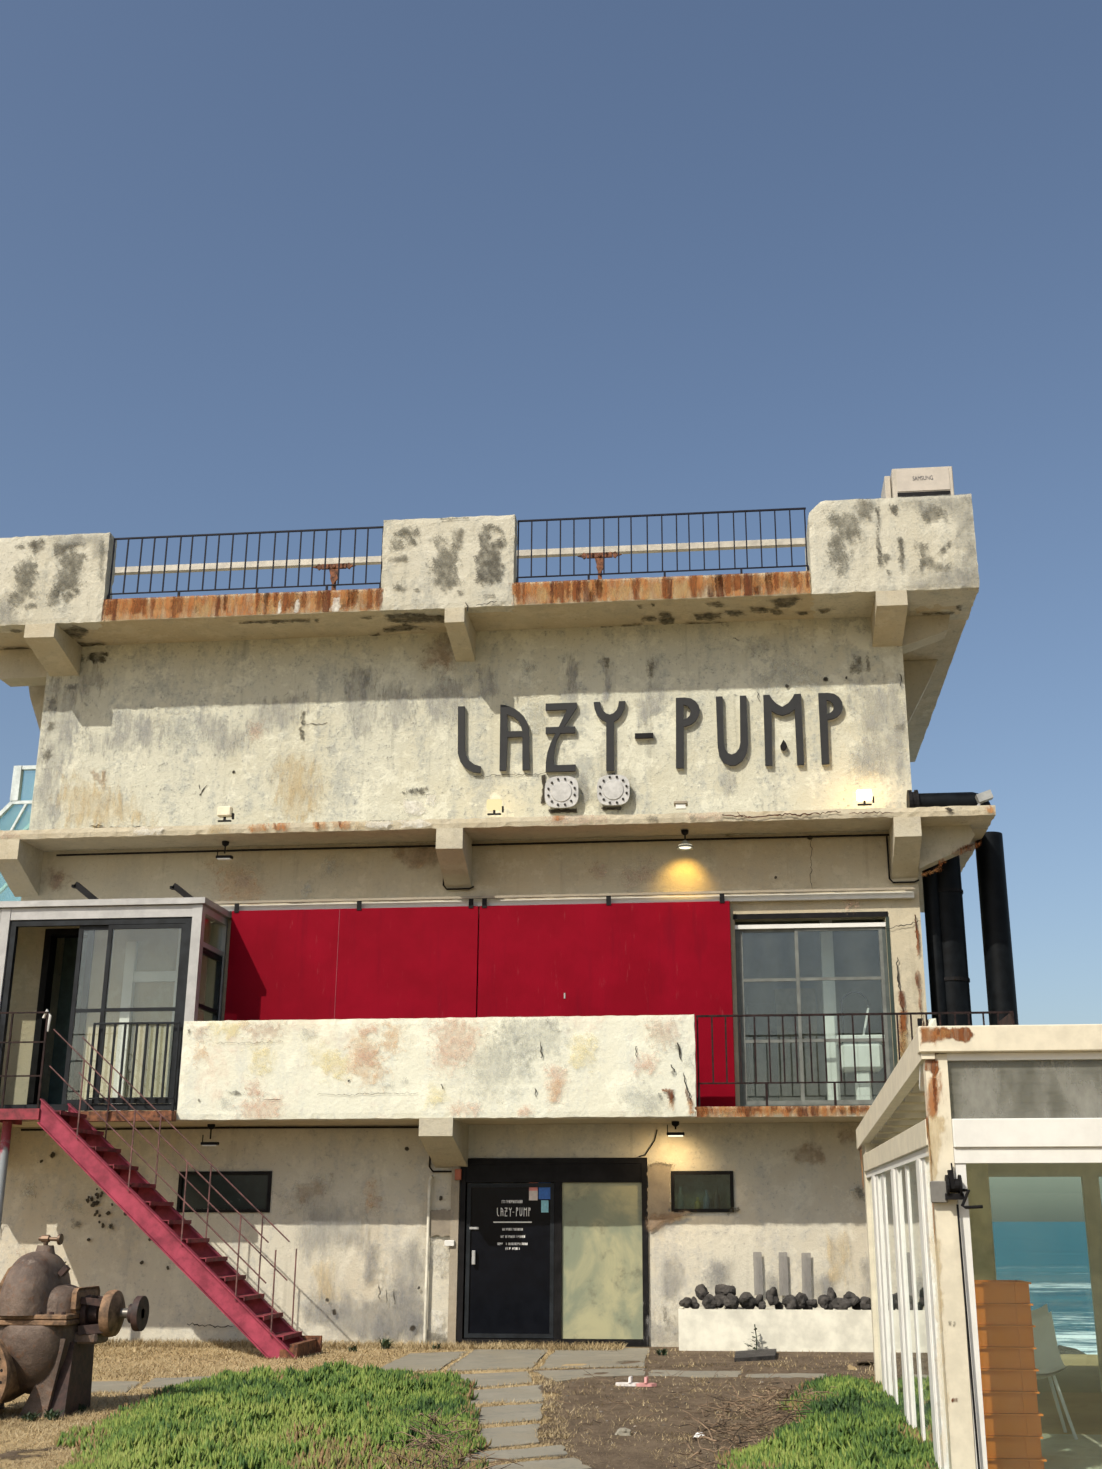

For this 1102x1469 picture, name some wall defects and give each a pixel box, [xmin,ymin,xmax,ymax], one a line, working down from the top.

corrosion [513,571,811,604]
corrosion [102,588,383,621]
corrosion [662,1089,871,1117]
corrosion [921,1027,973,1176]